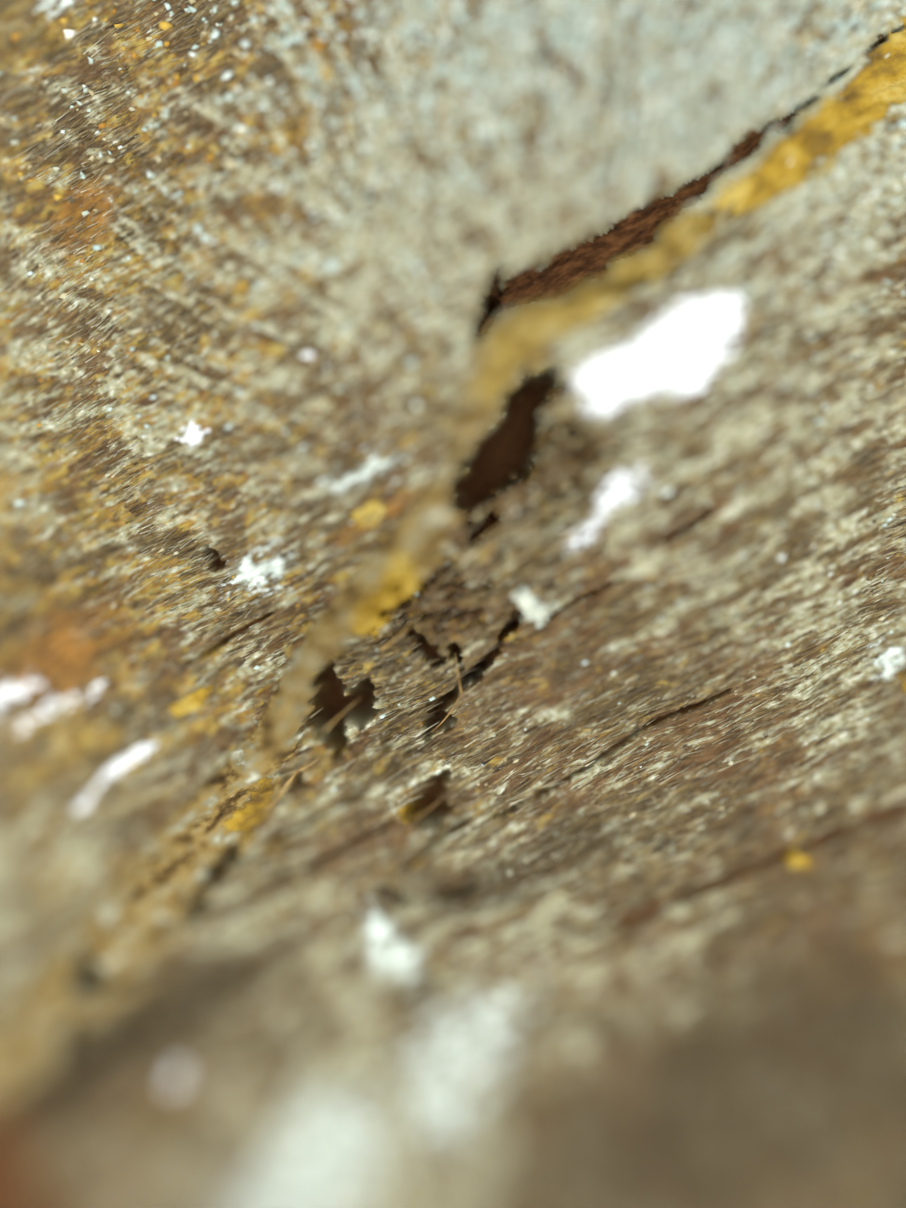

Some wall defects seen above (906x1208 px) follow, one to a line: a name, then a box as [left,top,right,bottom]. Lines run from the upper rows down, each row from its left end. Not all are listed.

crack [476,109,798,336]
crack [454,370,557,541]
crack [660,511,708,542]
crack [181,619,261,667]
crack [318,661,374,736]
crack [409,580,616,728]
crack [535,697,712,794]
crack [194,843,249,912]
crack [320,769,456,864]
crack [584,798,906,931]